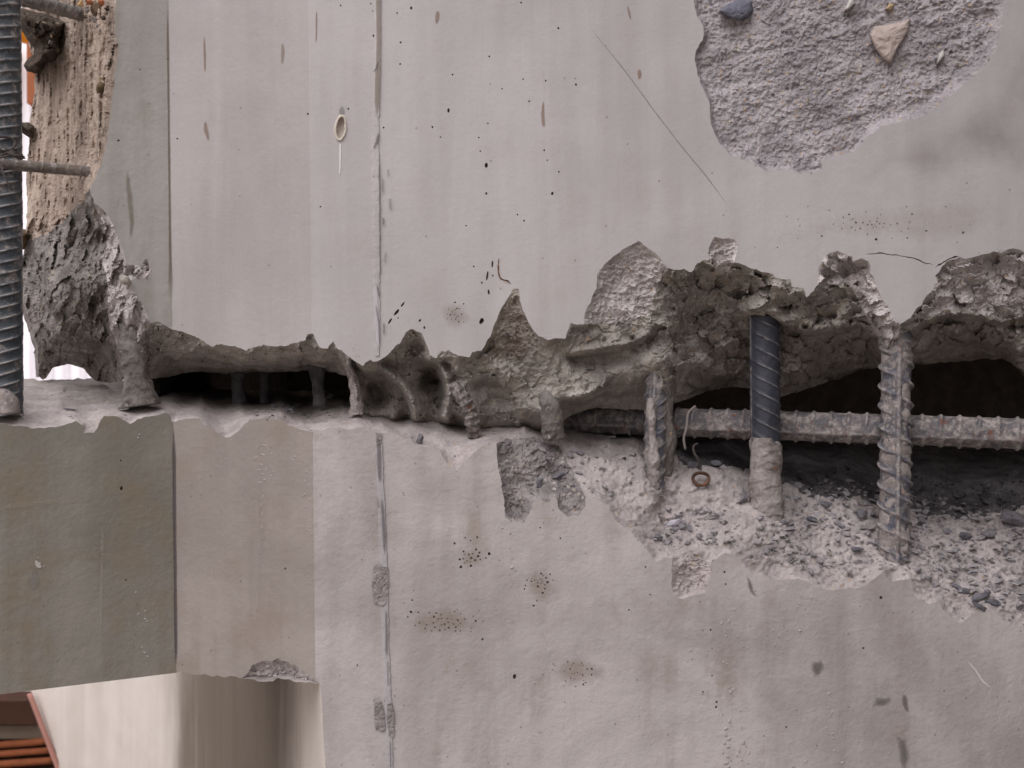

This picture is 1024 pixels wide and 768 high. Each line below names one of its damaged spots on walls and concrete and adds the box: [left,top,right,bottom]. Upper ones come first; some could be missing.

spalling [694,0,1004,175]
crack [873,252,958,267]
spalling [0,189,1024,627]
spalling [242,658,318,683]